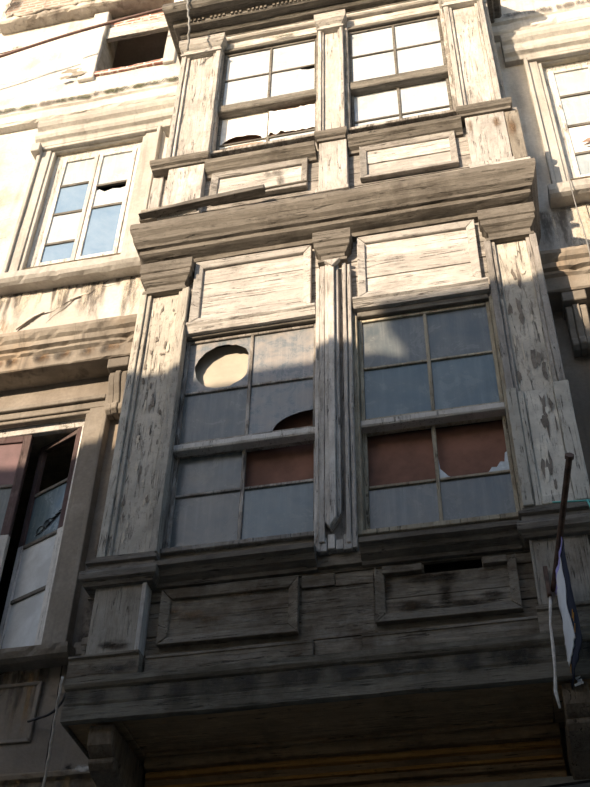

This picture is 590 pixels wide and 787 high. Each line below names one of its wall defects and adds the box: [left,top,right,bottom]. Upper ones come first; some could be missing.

flaking render [4,0,91,19]
water stain [539,203,590,246]
water stain [0,290,42,311]
water stain [52,281,104,309]
water stain [116,275,141,302]
peeling [508,240,533,324]
peeling [142,337,169,415]
peeling [513,335,548,379]
peeling [536,394,559,490]